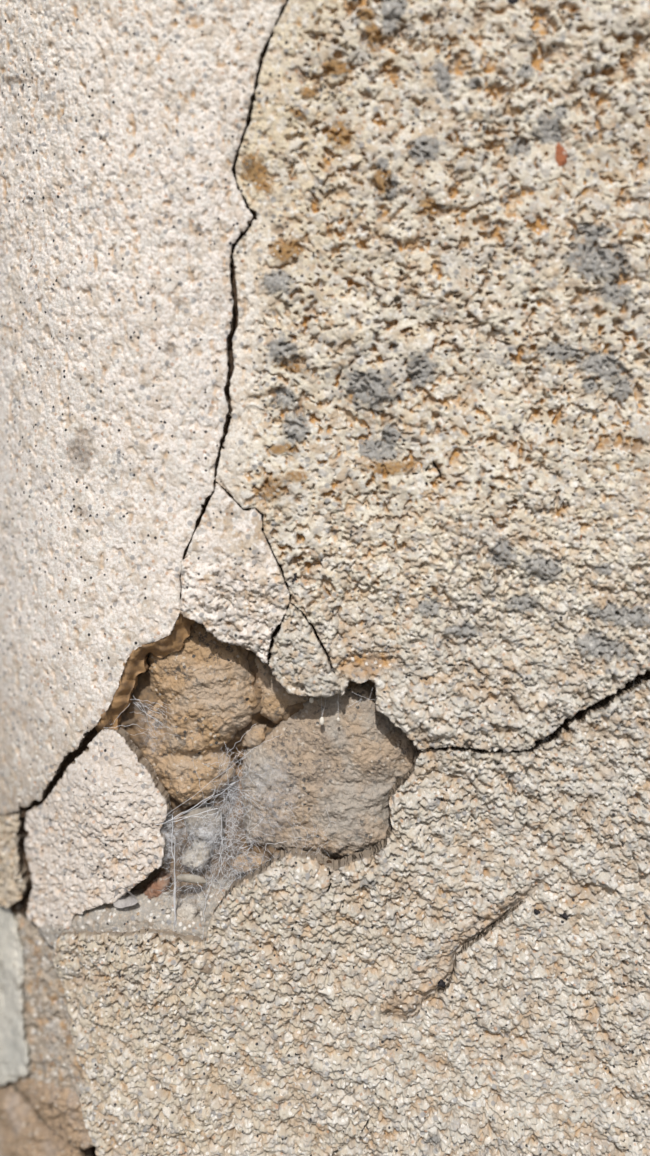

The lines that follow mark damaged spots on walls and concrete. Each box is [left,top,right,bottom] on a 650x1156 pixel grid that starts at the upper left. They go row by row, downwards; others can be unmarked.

crack [247,45,269,127]
crack [180,158,333,668]
spalling [331,650,399,691]
crack [534,670,650,742]
crack [11,719,112,915]
flaking render [6,483,312,1130]